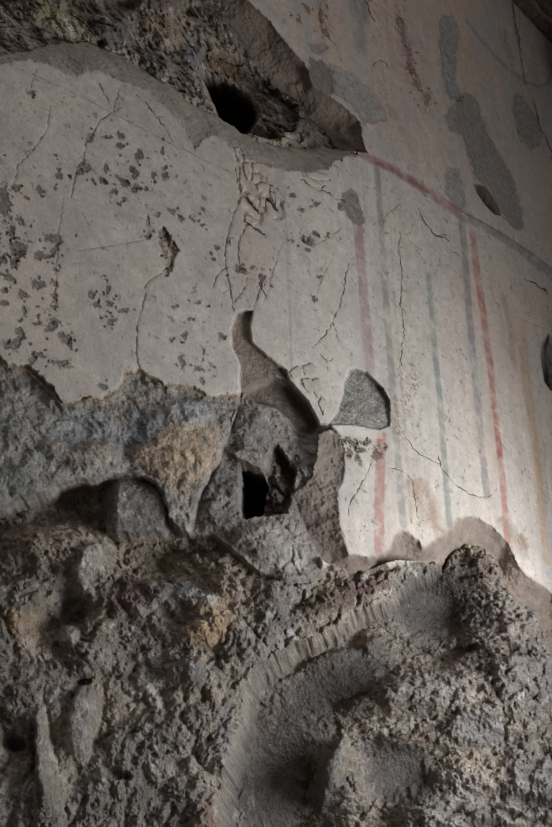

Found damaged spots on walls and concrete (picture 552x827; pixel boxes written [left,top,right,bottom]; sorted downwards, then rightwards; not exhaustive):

spalling [0,0,335,150]
crack [54,83,173,301]
peeling [54,127,178,206]
crack [213,148,288,311]
crack [301,172,343,200]
crack [136,264,172,369]
crack [289,268,349,416]
spalling [0,183,441,827]
crack [405,437,497,498]